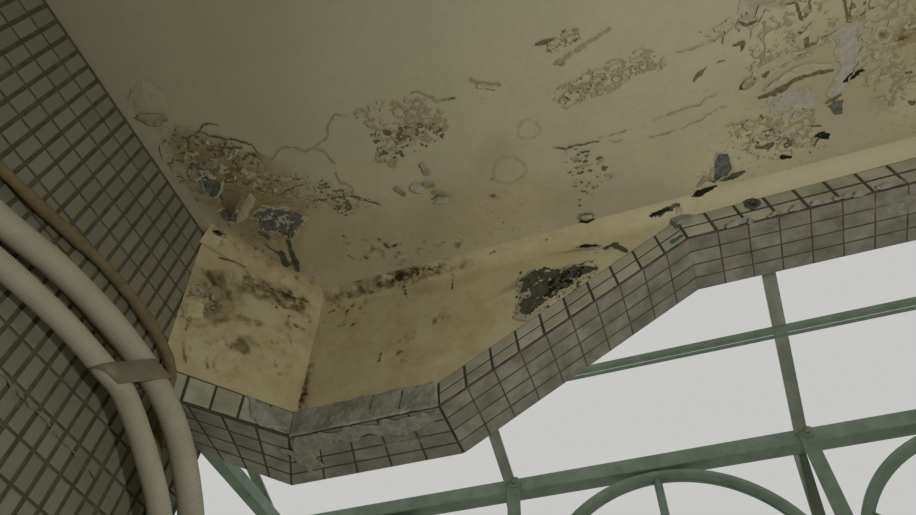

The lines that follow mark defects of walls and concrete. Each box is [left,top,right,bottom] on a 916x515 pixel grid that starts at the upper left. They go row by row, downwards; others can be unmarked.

peeling [535,27,612,66]
peeling [553,48,667,110]
peeling [691,0,916,197]
peeling [354,90,456,169]
peeling [160,123,381,272]
peeling [649,203,694,228]
spalling [744,198,761,210]
leakage [244,276,307,329]
leakage [329,266,441,313]